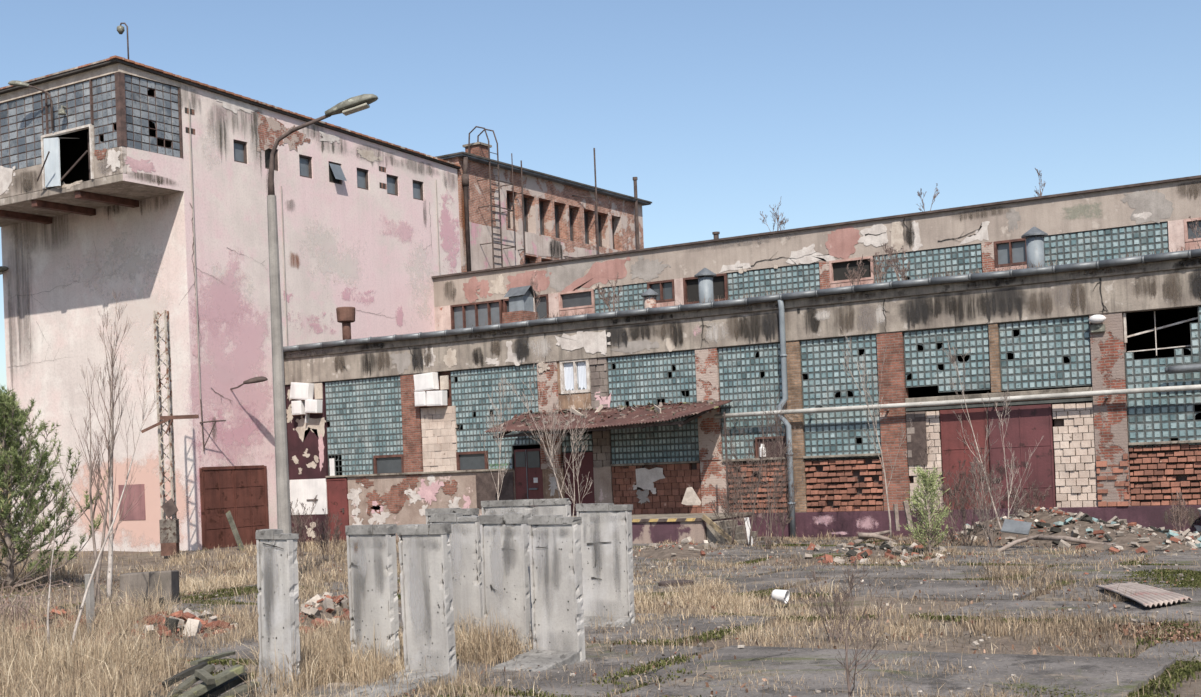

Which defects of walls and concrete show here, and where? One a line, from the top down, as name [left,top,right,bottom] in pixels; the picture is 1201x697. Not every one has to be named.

peeling [0,166,16,195]
peeling [774,221,923,269]
crack [865,218,978,243]
peeling [959,221,990,245]
leakage [9,246,29,380]
leakage [806,292,885,332]
leakage [901,258,1201,328]
leakage [360,343,390,375]
leakage [412,348,431,370]
peeling [286,389,326,474]
peeling [347,474,471,525]
peeling [633,467,665,504]